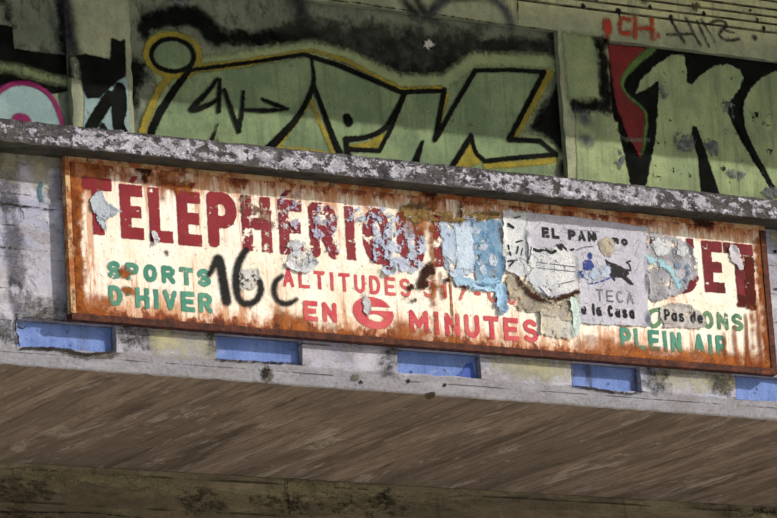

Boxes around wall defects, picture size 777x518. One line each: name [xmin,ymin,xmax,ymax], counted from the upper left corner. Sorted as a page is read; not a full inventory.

leakage [0,153,67,342]
rust [70,163,193,316]
rust [239,194,278,227]
rust [279,310,358,335]
peeling [0,122,777,218]
rust [392,322,428,340]
rust [400,192,500,304]
rust [517,275,581,304]
rust [578,238,771,368]